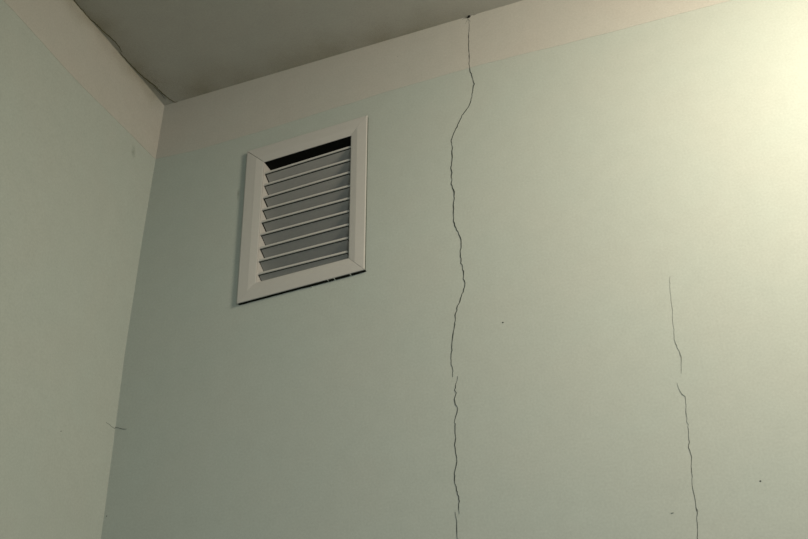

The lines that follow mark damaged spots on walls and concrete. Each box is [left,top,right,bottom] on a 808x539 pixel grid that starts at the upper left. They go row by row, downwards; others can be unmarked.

crack [74,0,176,103]
crack [451,33,475,539]